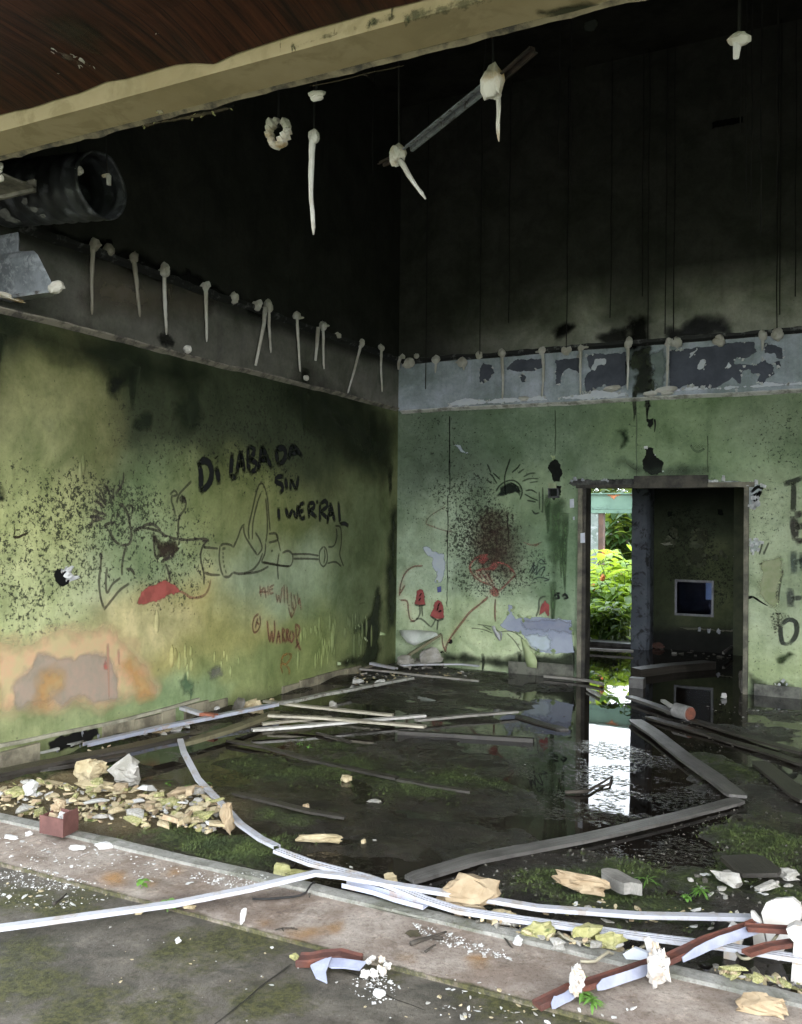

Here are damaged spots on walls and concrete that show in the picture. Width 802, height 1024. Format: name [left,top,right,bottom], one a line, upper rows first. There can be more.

peeling [448,352,629,407]
peeling [669,342,802,392]
water stain [154,537,182,564]
water stain [337,509,397,667]
peeling [492,605,574,668]